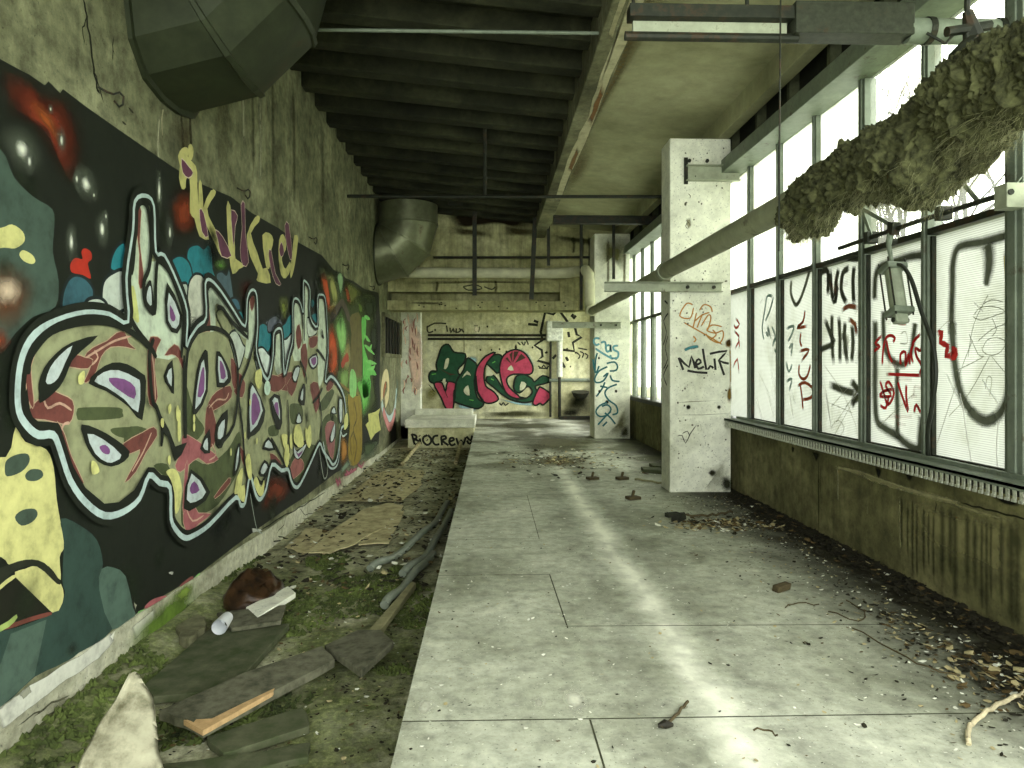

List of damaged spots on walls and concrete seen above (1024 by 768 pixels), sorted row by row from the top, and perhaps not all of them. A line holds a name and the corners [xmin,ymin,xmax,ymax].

crack [82,0,115,100]
water stain [837,466,1019,621]